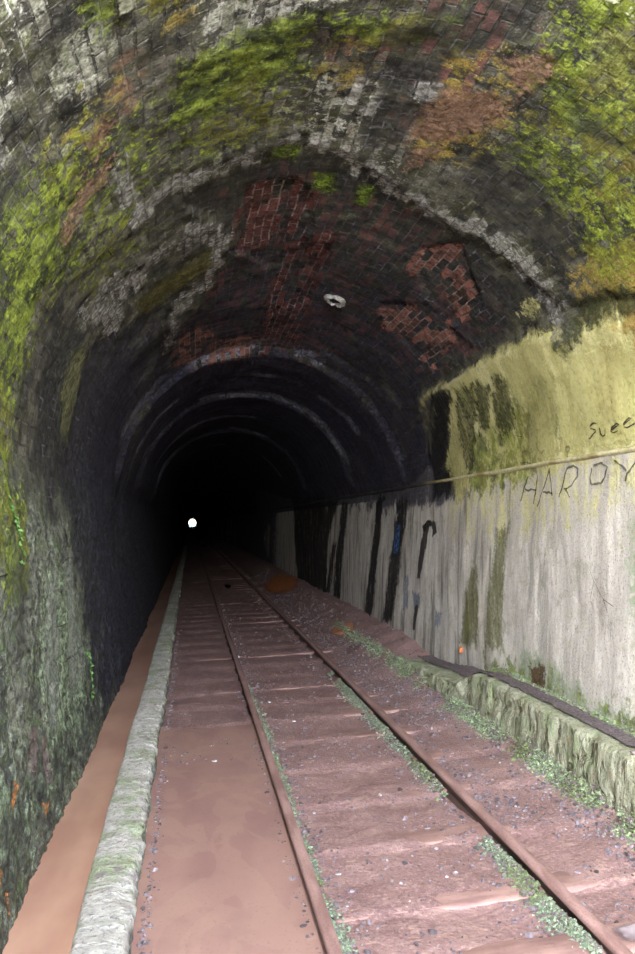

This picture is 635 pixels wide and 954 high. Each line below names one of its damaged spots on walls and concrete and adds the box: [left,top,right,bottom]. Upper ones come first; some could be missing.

leakage [112,152,140,225]
leakage [78,211,234,355]
leakage [430,341,635,503]